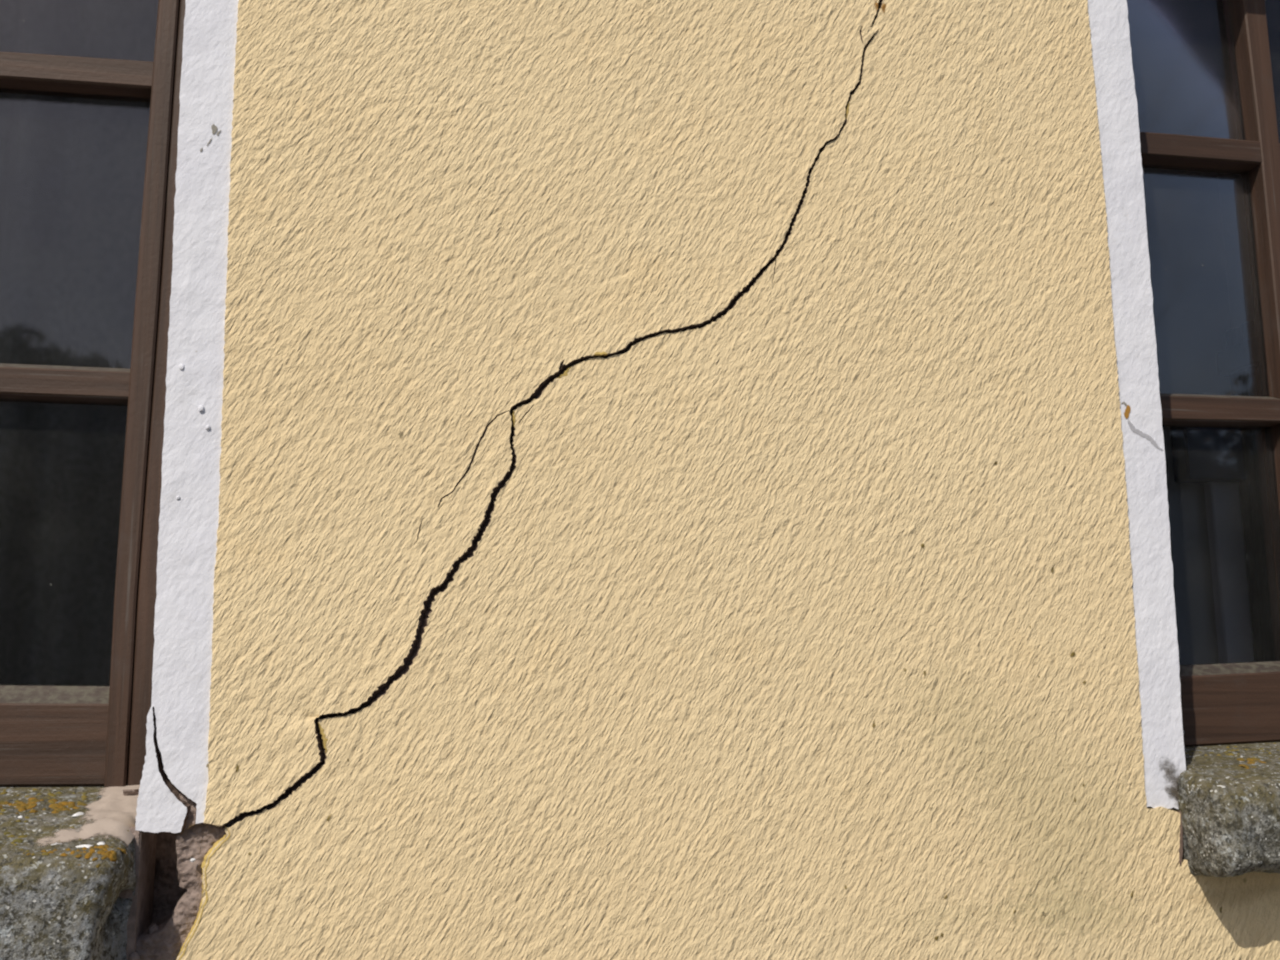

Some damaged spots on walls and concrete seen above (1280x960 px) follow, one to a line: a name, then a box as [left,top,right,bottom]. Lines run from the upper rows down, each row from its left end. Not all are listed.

crack [152,0,883,836]
spalling [118,794,232,960]